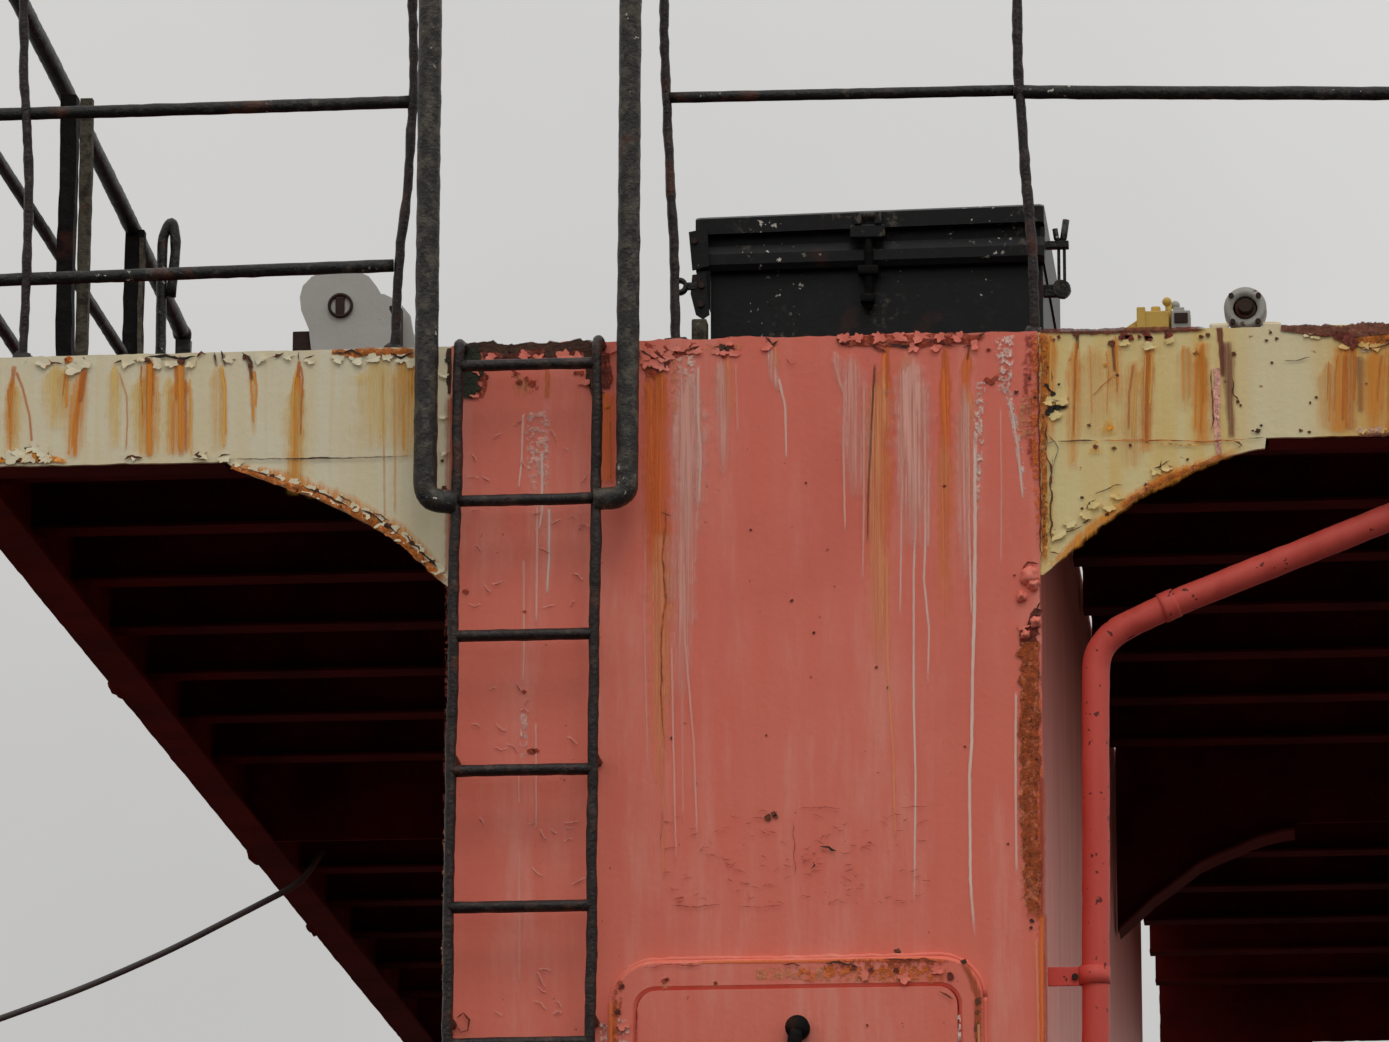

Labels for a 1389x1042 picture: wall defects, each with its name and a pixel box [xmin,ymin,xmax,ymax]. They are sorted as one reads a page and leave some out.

corrosion [134,361,193,455]
peeling [114,347,415,369]
corrosion [291,361,304,479]
peeling [193,448,446,580]
peeling [438,338,617,398]
leakage [833,352,866,570]
peeling [836,331,985,353]
leakage [644,355,709,867]
leakage [895,354,930,885]
leakage [957,335,1025,922]
corrosion [1014,642,1047,1042]
corrosion [645,948,982,1042]